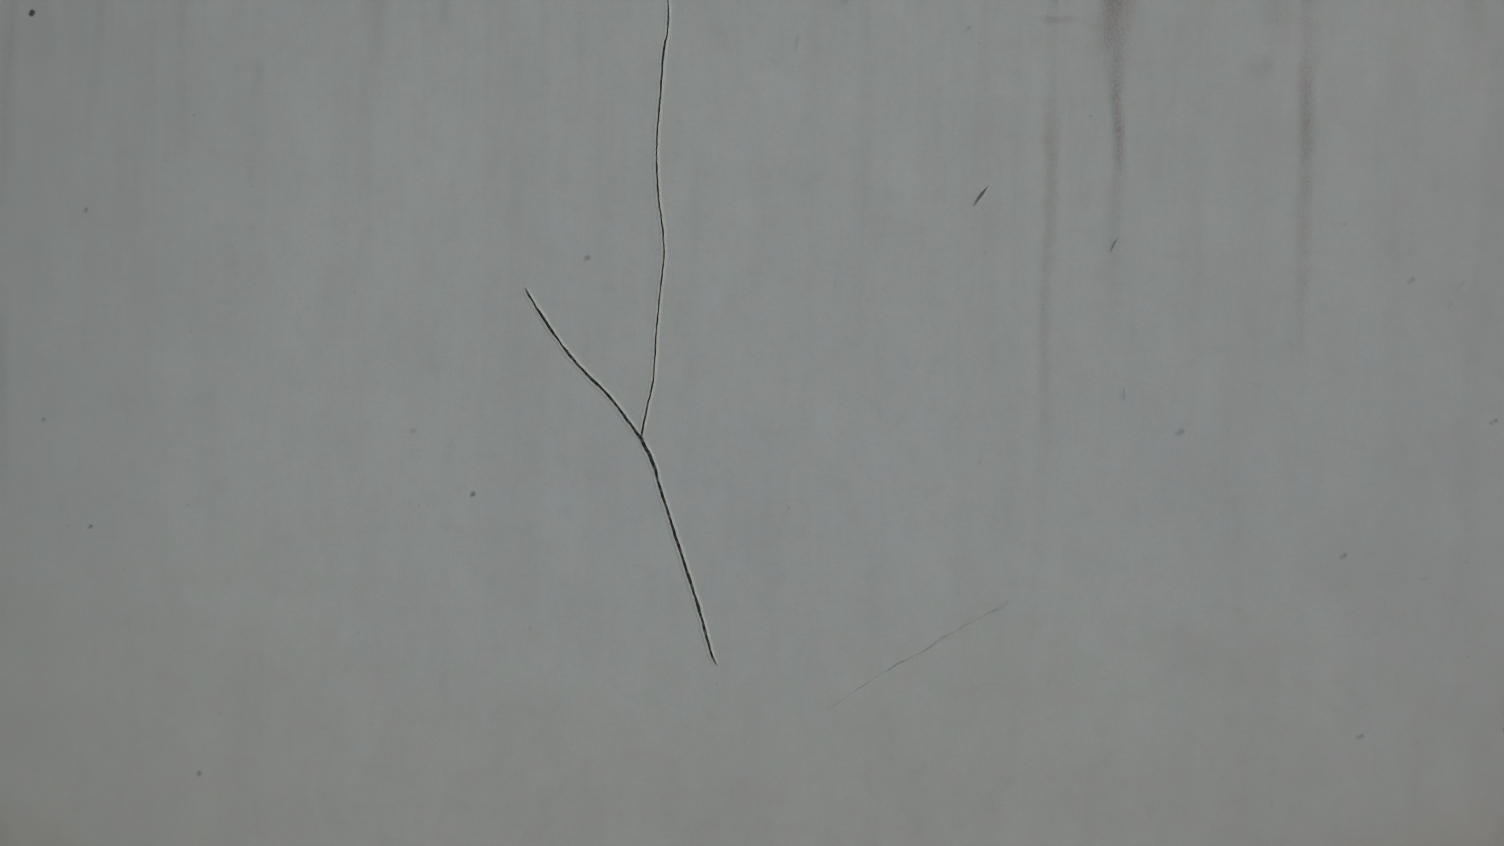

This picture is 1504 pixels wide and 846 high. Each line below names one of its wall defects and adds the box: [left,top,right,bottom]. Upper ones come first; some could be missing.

crack [526,0,715,661]